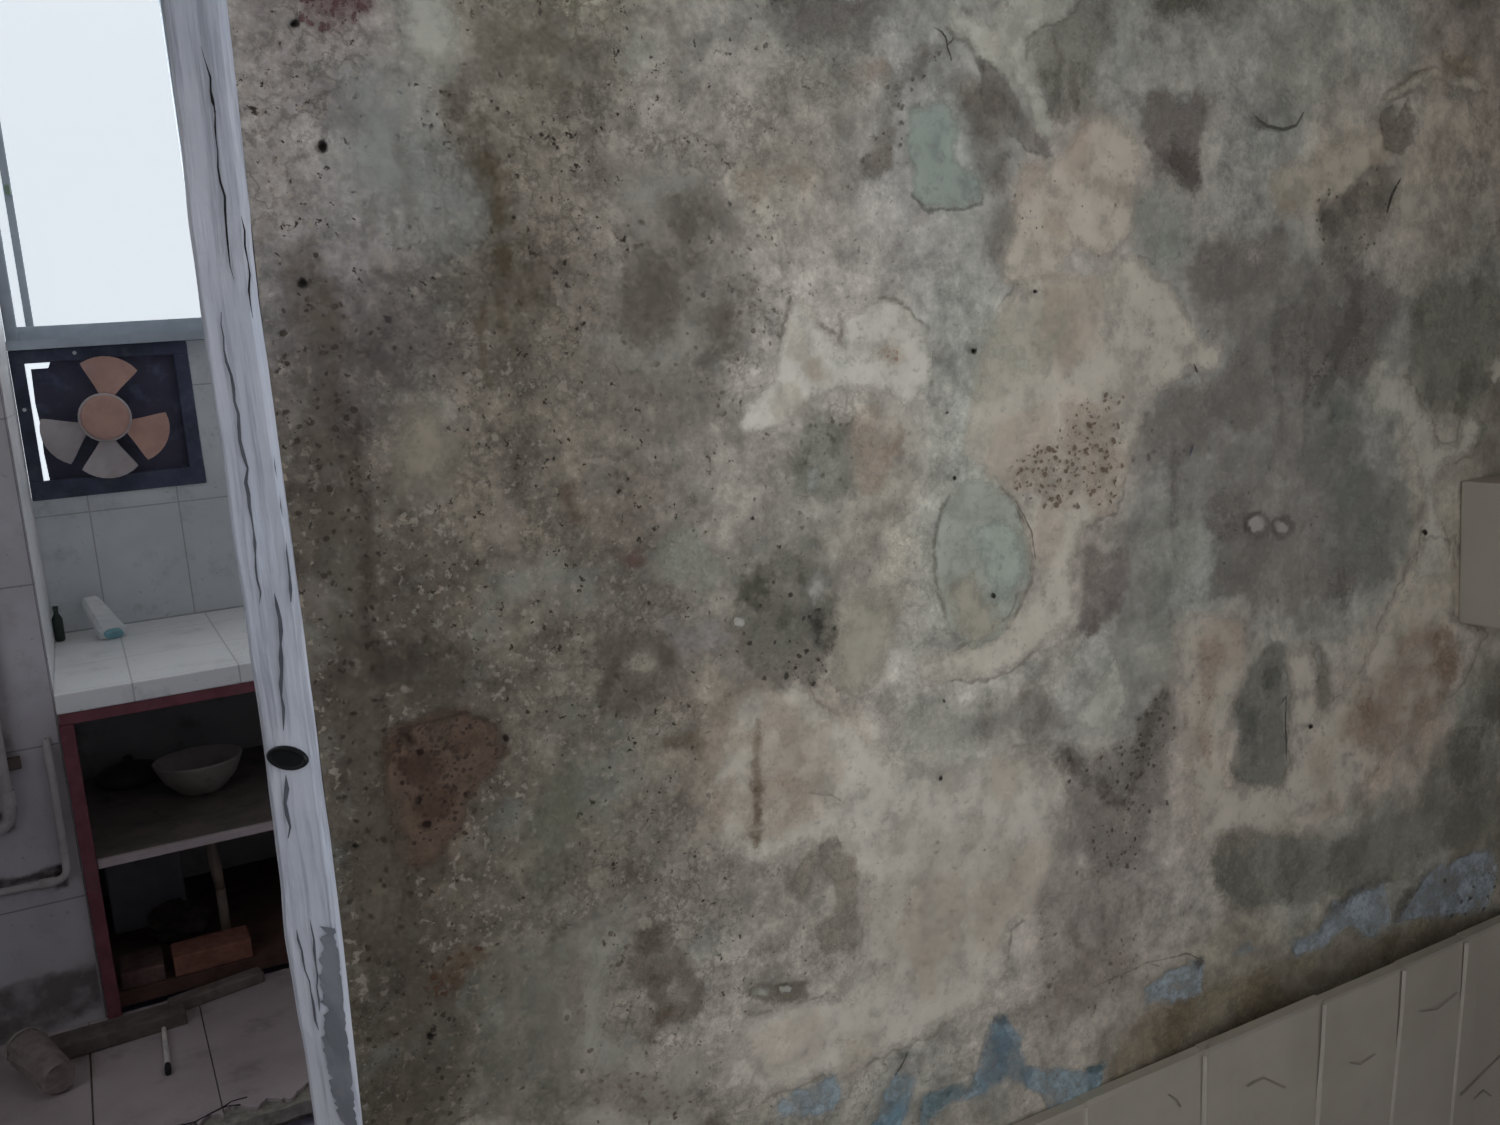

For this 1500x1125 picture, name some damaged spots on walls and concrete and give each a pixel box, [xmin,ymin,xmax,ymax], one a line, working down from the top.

crack [1255,112,1304,131]
flaking render [740,300,932,432]
flaking render [918,117,1222,681]
flaking render [708,686,1066,1092]